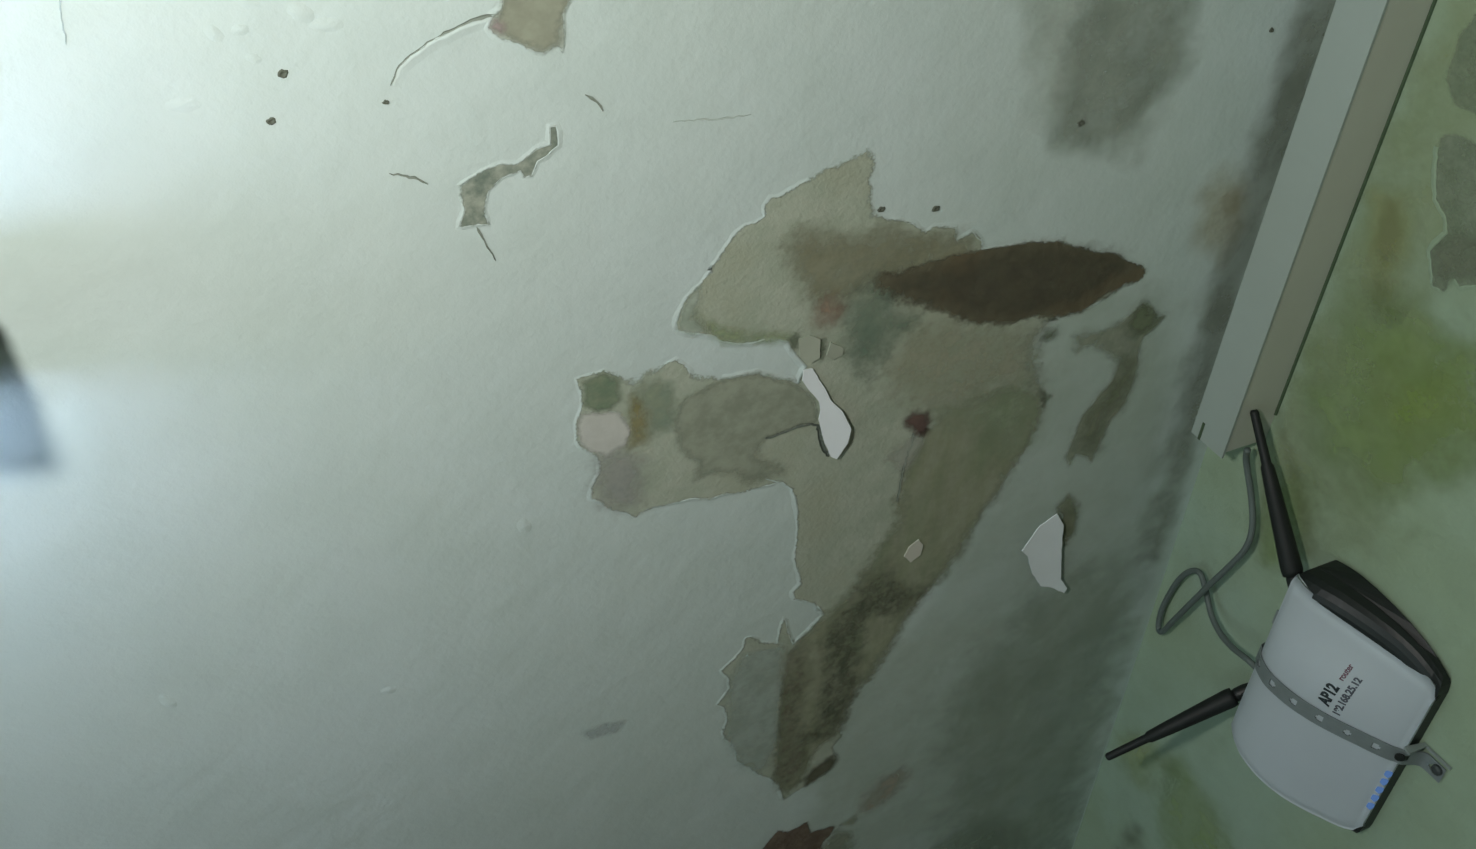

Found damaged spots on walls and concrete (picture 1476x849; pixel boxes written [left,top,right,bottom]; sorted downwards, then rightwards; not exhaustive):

crack [390,14,500,88]
peeling [483,0,573,57]
peeling [455,122,563,261]
water stain [876,241,1145,325]
peeling [572,152,1146,801]
spalling [763,822,850,849]